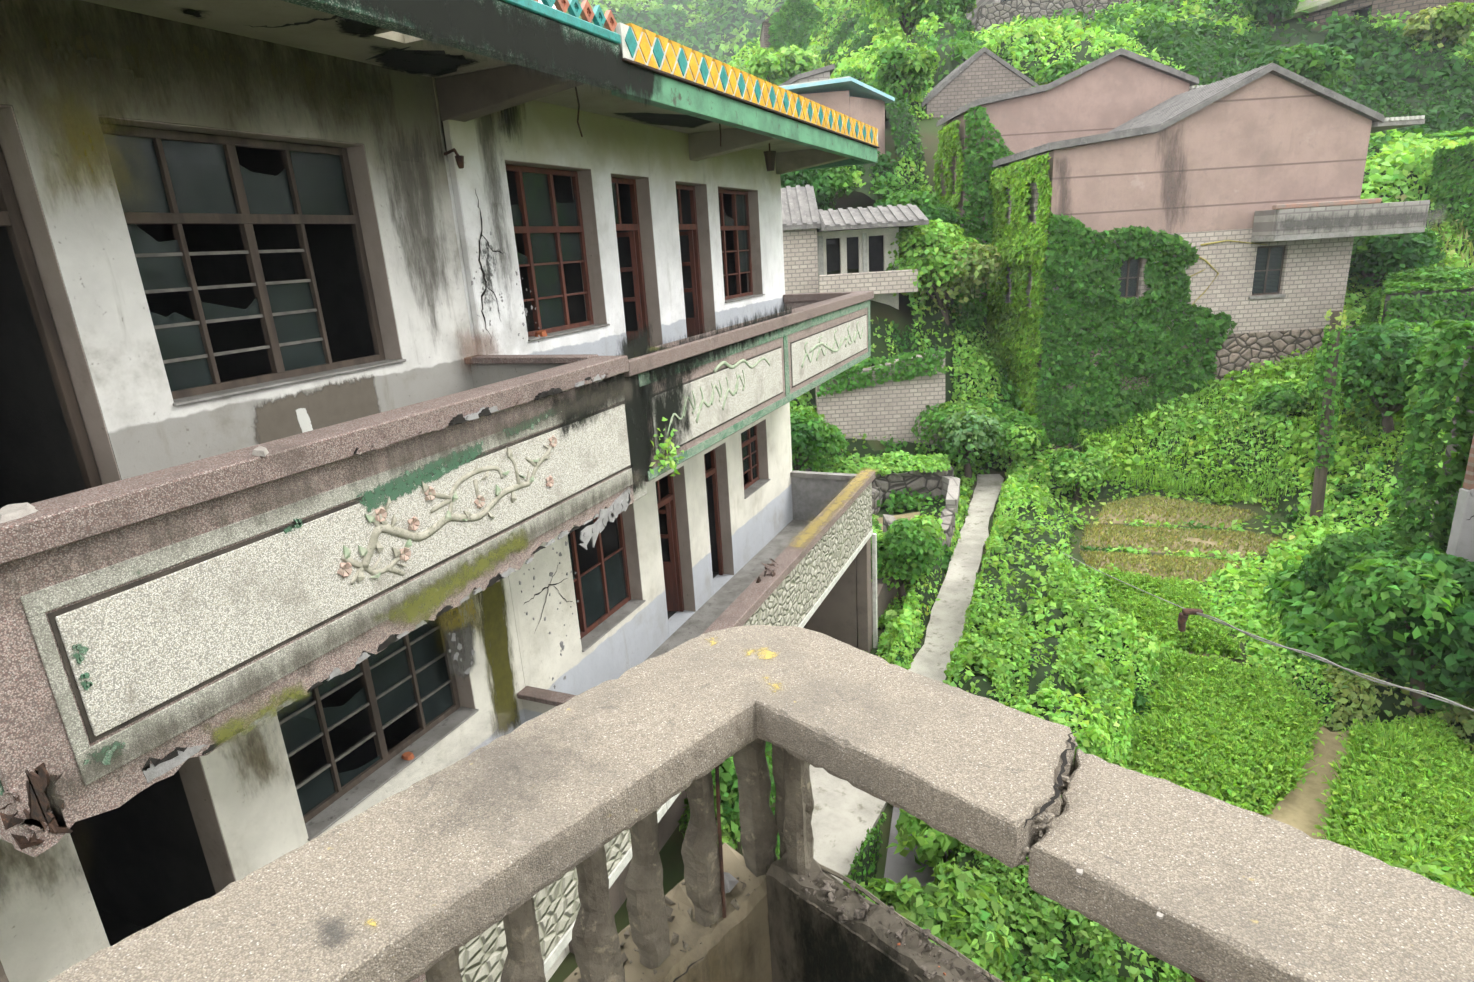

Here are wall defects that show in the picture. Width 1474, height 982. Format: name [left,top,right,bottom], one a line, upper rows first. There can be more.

damp [5,0,392,128]
flaking render [335,16,478,77]
crack [475,190,506,344]
peeling [20,368,633,785]
damp [54,549,498,803]
spalling [0,763,73,850]
crack [1020,728,1078,865]
crack [673,957,704,982]